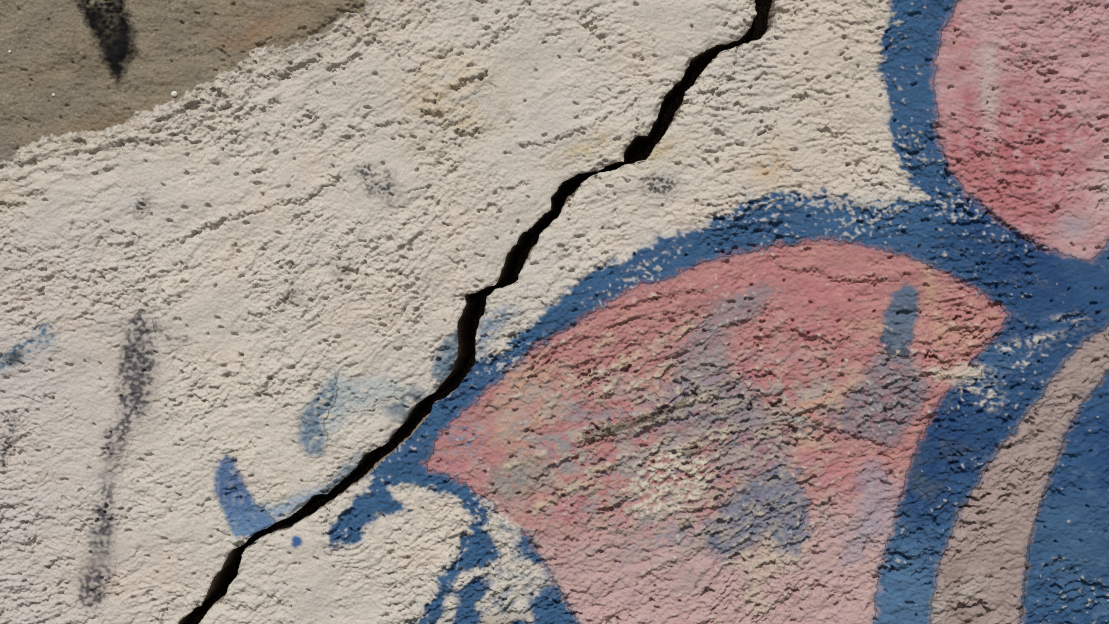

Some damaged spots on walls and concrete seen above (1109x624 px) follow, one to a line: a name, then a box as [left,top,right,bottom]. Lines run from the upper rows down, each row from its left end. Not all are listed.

spalling [0,0,372,173]
crack [159,0,779,624]